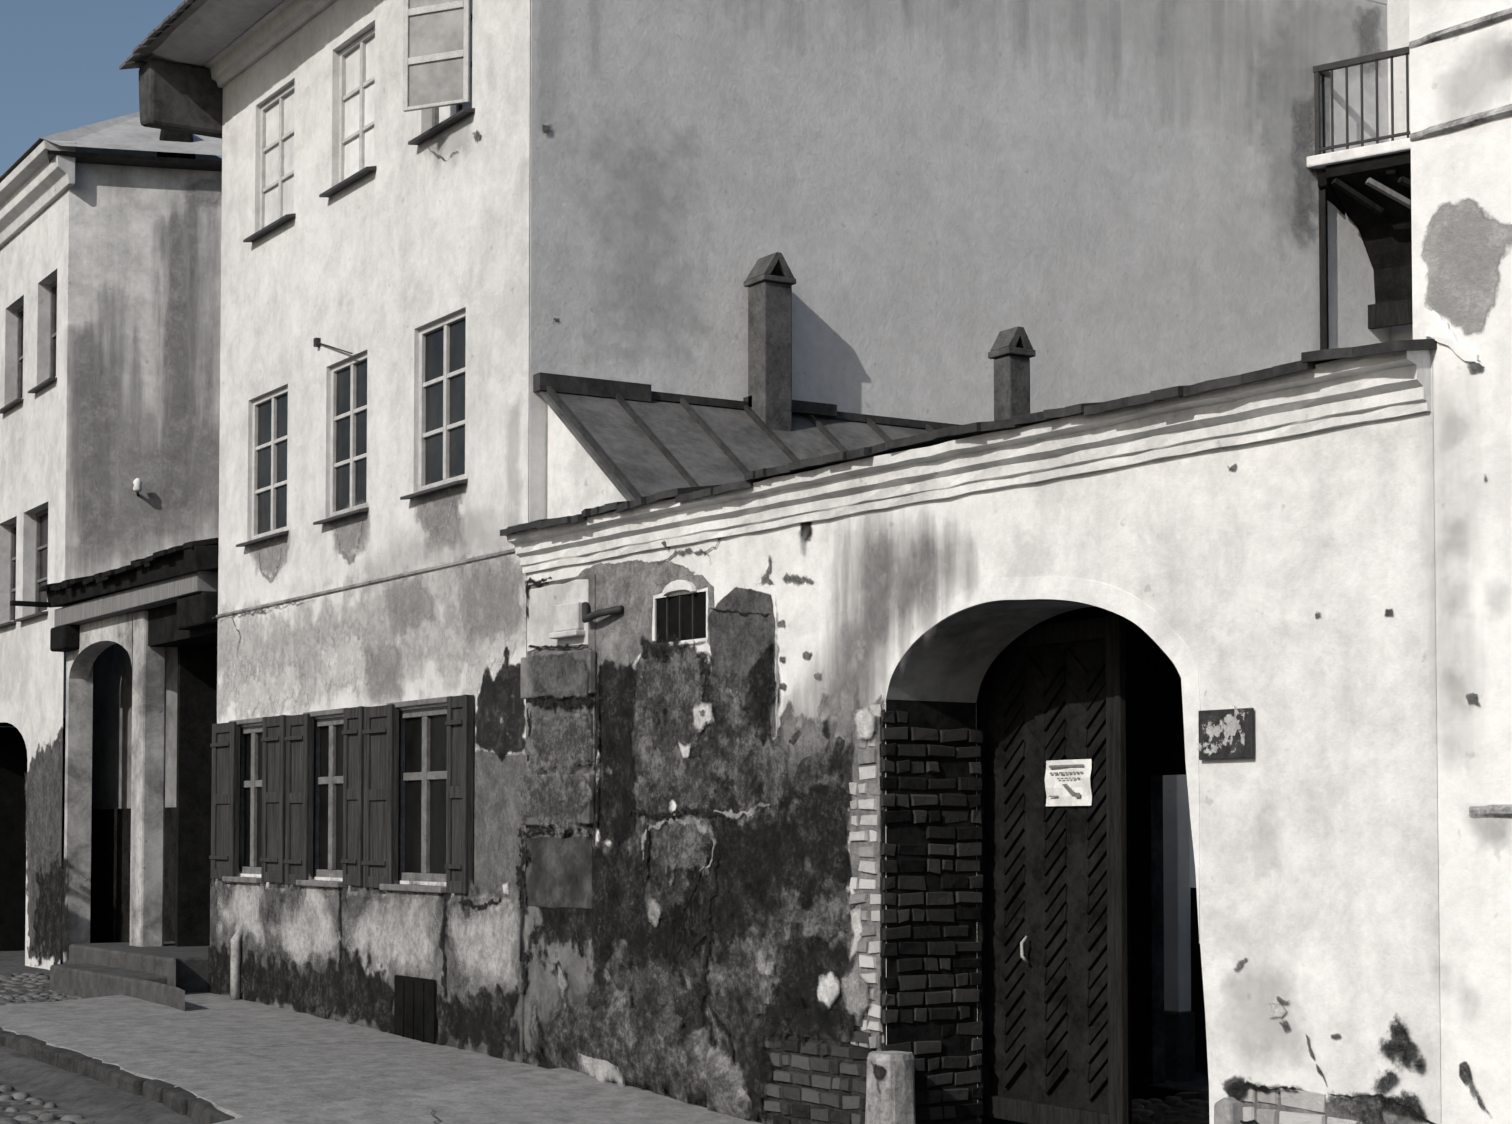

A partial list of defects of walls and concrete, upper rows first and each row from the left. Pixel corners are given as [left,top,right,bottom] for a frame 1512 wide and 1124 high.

damp [73,179,222,562]
peeling [1422,199,1512,373]
damp [742,535,951,764]
damp [25,727,70,966]
damp [208,878,520,1062]
peeling [462,630,983,1124]
spalling [1223,1016,1436,1124]